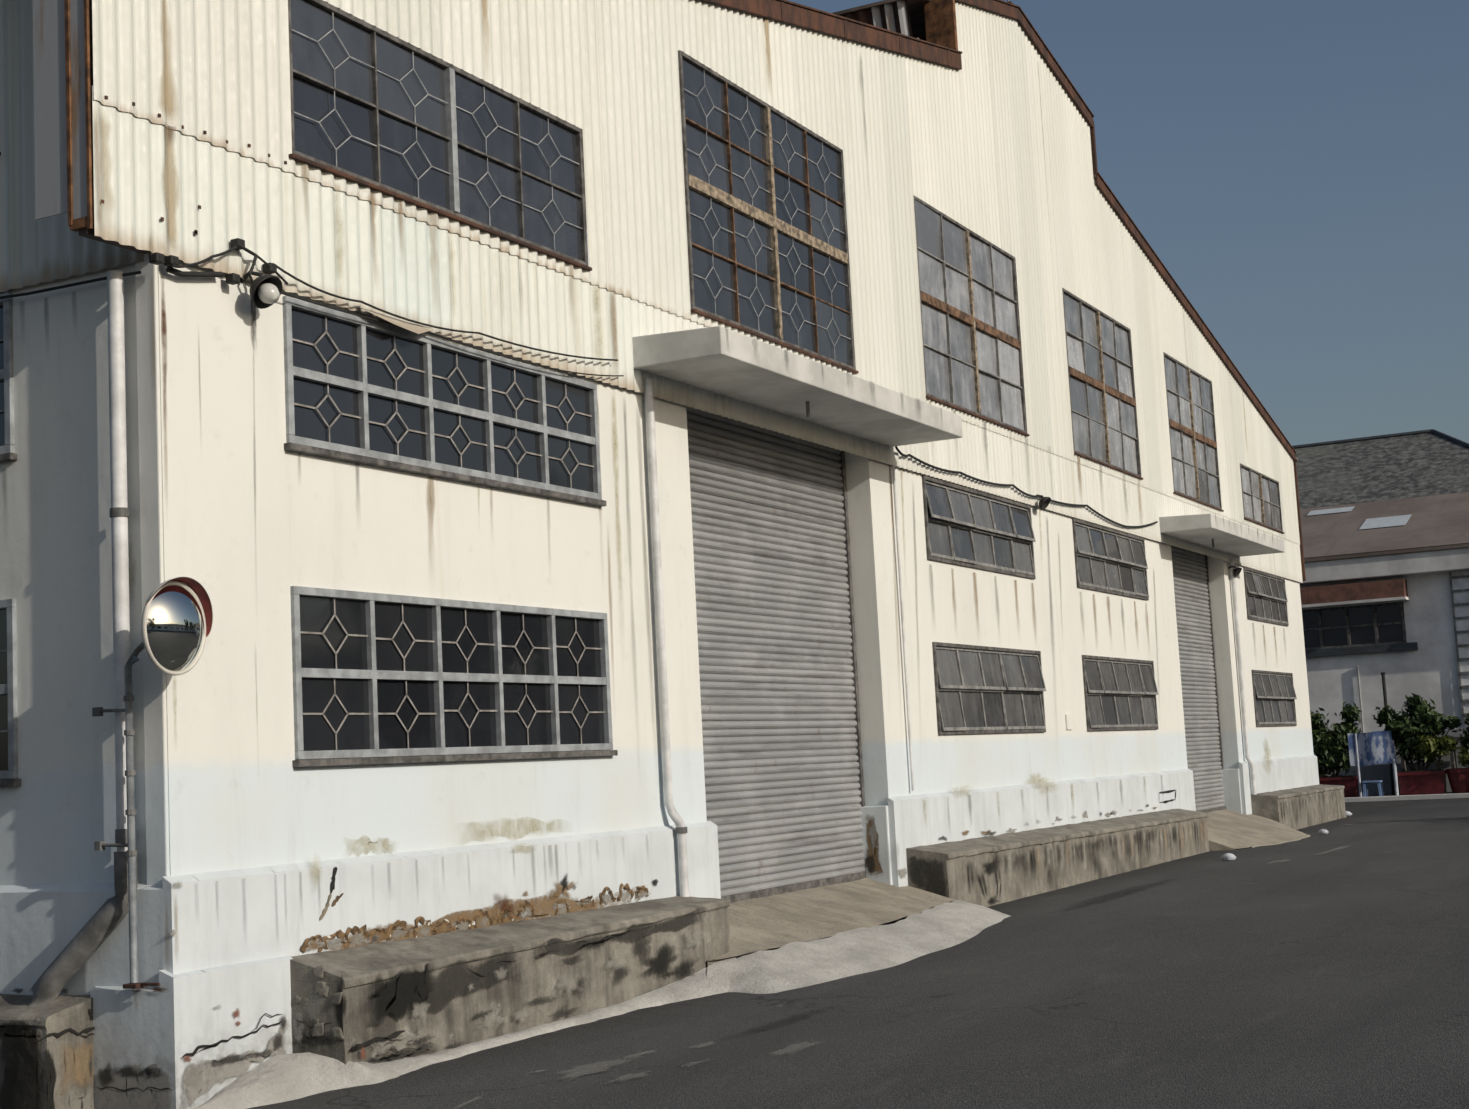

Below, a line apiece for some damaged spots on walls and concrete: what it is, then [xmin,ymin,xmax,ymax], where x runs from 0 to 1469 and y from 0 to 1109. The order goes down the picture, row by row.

corrosion [163,0,175,241]
flaking render [865,817,883,874]
crack [320,867,344,920]
peeling [301,875,658,953]
crack [182,1013,281,1058]